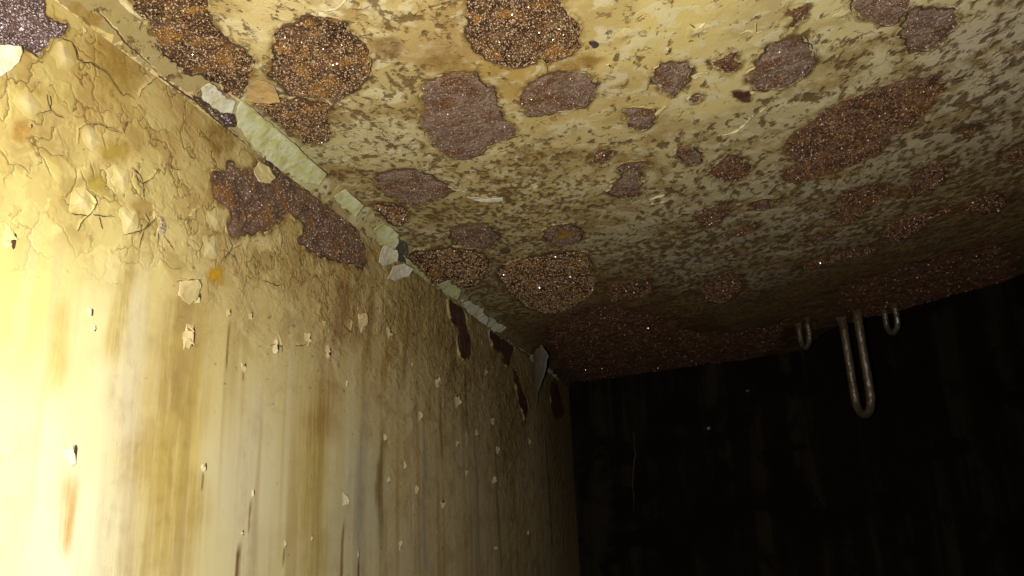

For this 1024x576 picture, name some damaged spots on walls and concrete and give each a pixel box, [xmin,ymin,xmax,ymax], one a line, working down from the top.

rust [0,0,70,61]
crack [71,149,202,250]
crack [35,9,263,157]
rust [129,0,398,146]
peeling [201,80,327,185]
rust [189,91,367,272]
peeling [333,189,365,218]
rust [416,0,599,160]
rust [649,6,821,104]
peeling [178,280,202,305]
crack [176,237,242,282]
peeling [374,223,560,403]